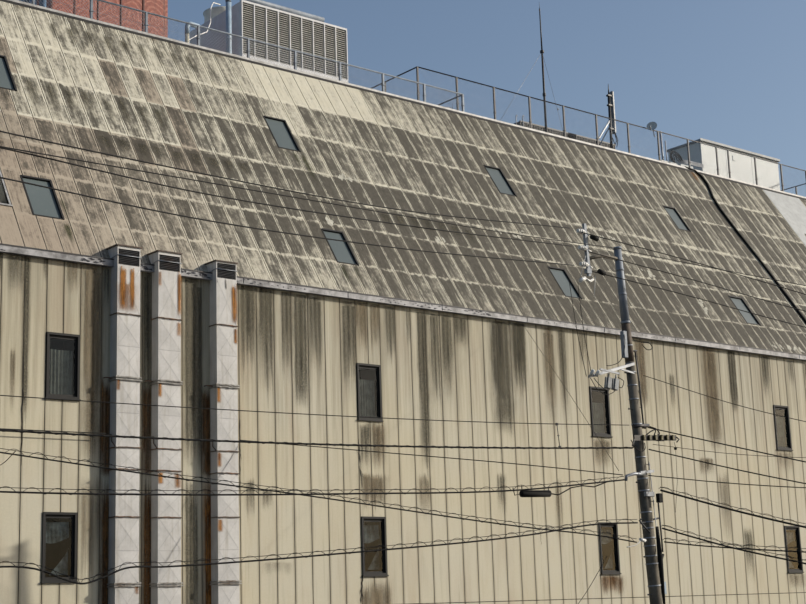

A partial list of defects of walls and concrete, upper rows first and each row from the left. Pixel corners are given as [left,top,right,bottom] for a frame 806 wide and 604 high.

corrosion [101,380,120,473]
corrosion [143,383,162,473]
corrosion [203,388,221,474]
water stain [241,285,272,359]
water stain [282,292,321,395]
water stain [418,312,465,446]
water stain [492,321,525,422]
water stain [703,347,719,442]
water stain [728,351,737,407]
corrosion [101,492,109,604]
corrosion [143,488,151,604]
corrosion [204,491,222,604]